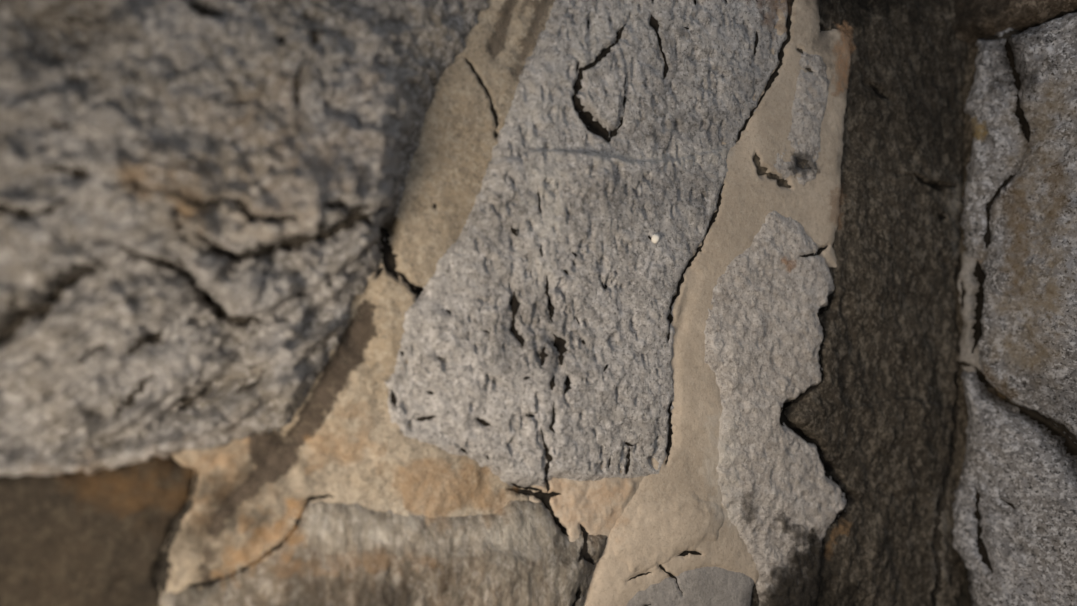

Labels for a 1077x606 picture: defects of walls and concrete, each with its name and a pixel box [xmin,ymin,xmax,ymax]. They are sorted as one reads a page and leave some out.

crack [48,120,72,129]
crack [572,0,669,142]
crack [980,9,1077,143]
crack [0,164,89,220]
crack [0,243,262,346]
crack [191,198,423,298]
crack [507,246,595,565]
crack [931,174,1077,606]
crack [572,588,581,606]